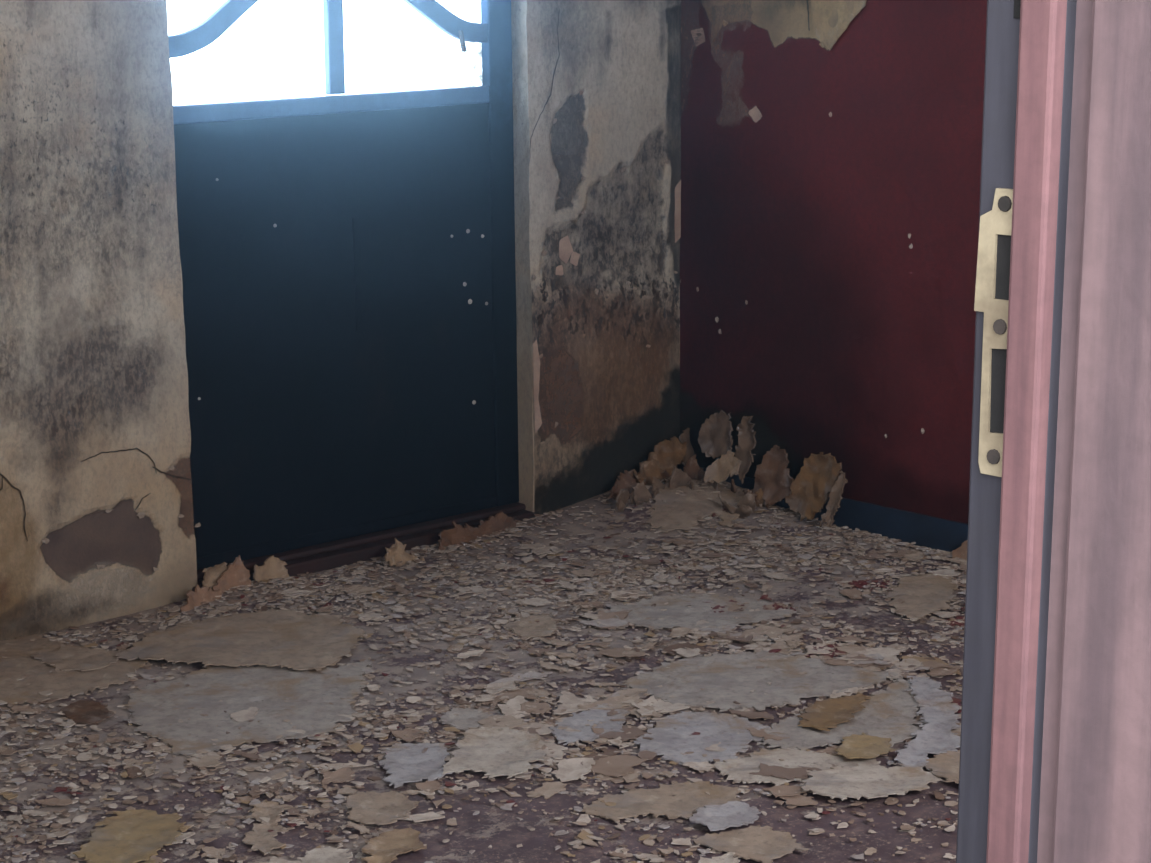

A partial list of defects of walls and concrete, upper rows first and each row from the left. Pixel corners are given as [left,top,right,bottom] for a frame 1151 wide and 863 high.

damp [28,328,159,457]
peeling [533,339,558,445]
damp [532,271,804,515]
crack [0,473,28,541]
spalling [40,499,162,583]
crack [81,448,193,510]
spalling [165,458,201,538]